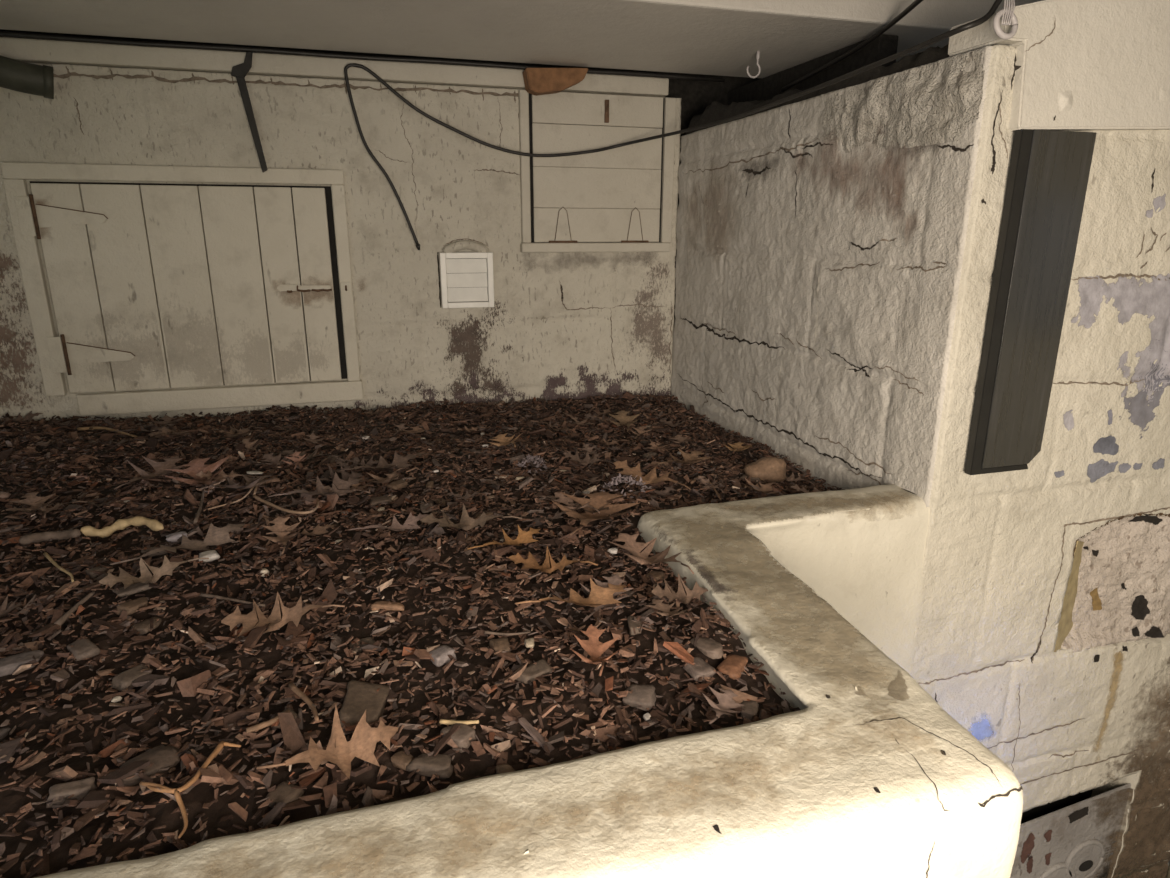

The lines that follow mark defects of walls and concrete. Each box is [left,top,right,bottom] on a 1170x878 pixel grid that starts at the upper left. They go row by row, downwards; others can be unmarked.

crack [674,110,834,216]
crack [937,15,1055,204]
leakage [0,254,43,409]
leakage [354,264,673,412]
crack [559,281,925,495]
peeling [1071,273,1170,483]
leakage [1100,760,1170,878]